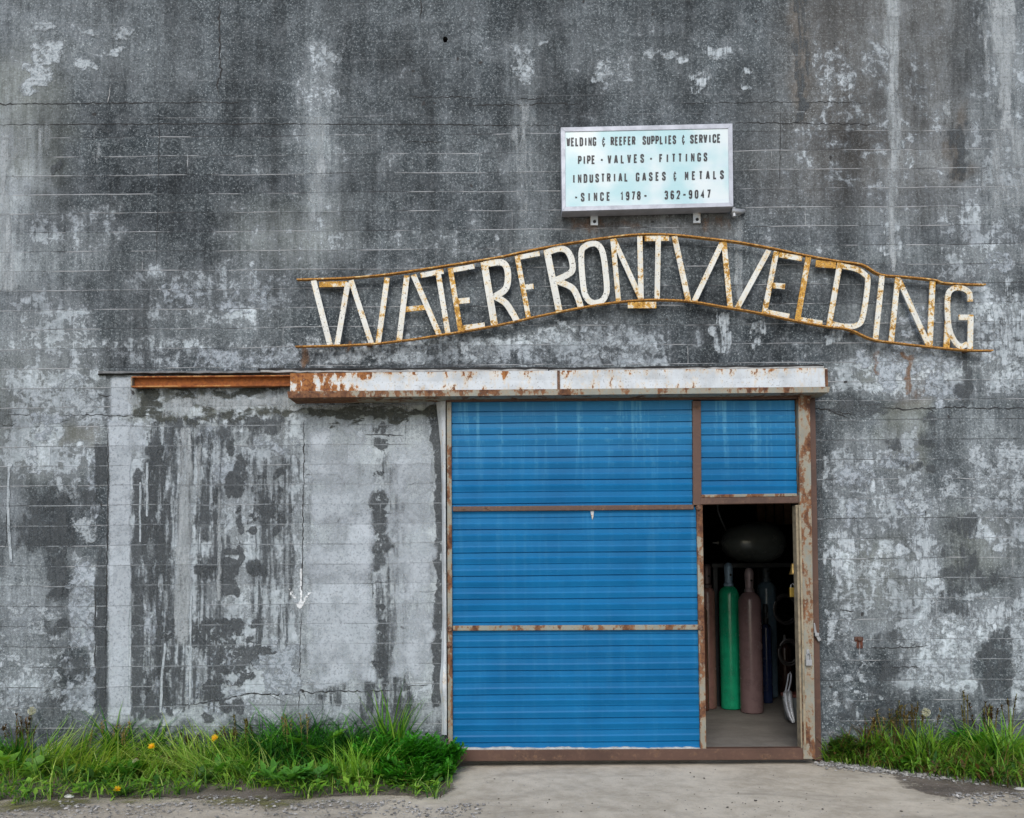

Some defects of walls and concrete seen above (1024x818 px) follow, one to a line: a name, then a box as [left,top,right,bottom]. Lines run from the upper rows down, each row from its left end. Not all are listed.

crack [0,2,577,270]
crack [815,404,1021,417]
leakage [6,377,442,727]
leakage [939,512,1000,617]
leakage [975,626,1012,698]